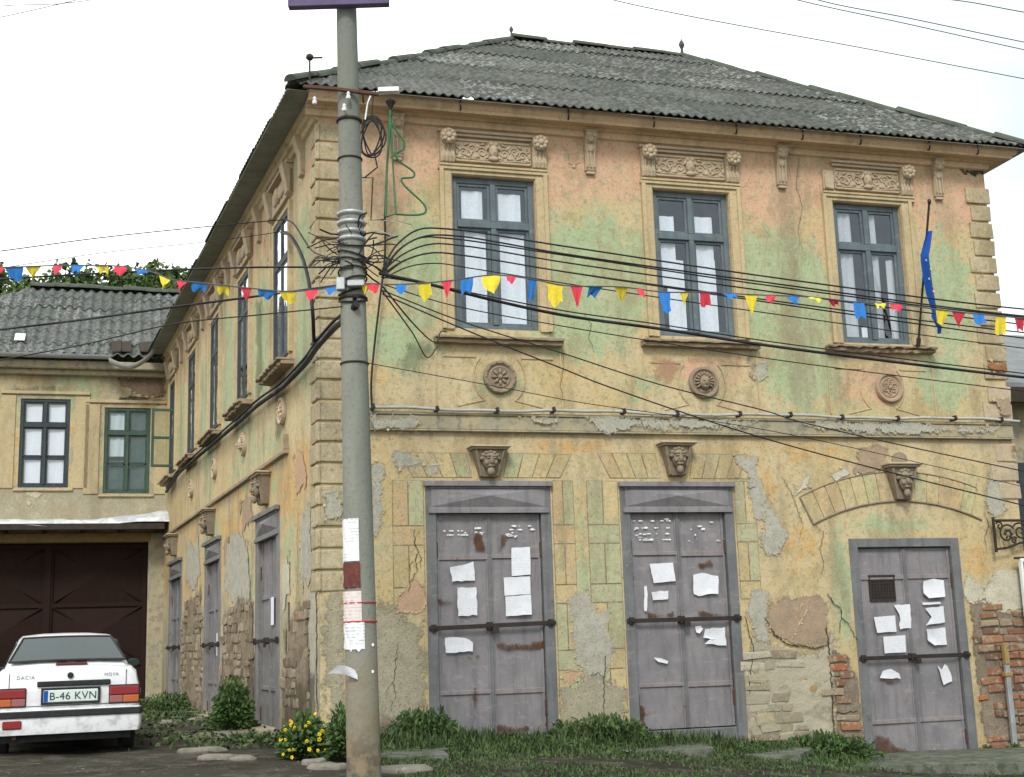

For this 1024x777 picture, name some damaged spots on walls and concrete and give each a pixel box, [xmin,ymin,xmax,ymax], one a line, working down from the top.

flaking render [370,412,424,434]
flaking render [585,415,758,435]
flaking render [223,494,253,607]
flaking render [282,487,346,724]
flaking render [376,578,428,733]
crack [408,529,422,592]
rust [474,533,485,551]
rust [497,641,545,651]
flaking render [559,585,630,734]
crack [745,483,858,732]
flaking render [745,587,864,752]
flaking render [964,567,1024,748]